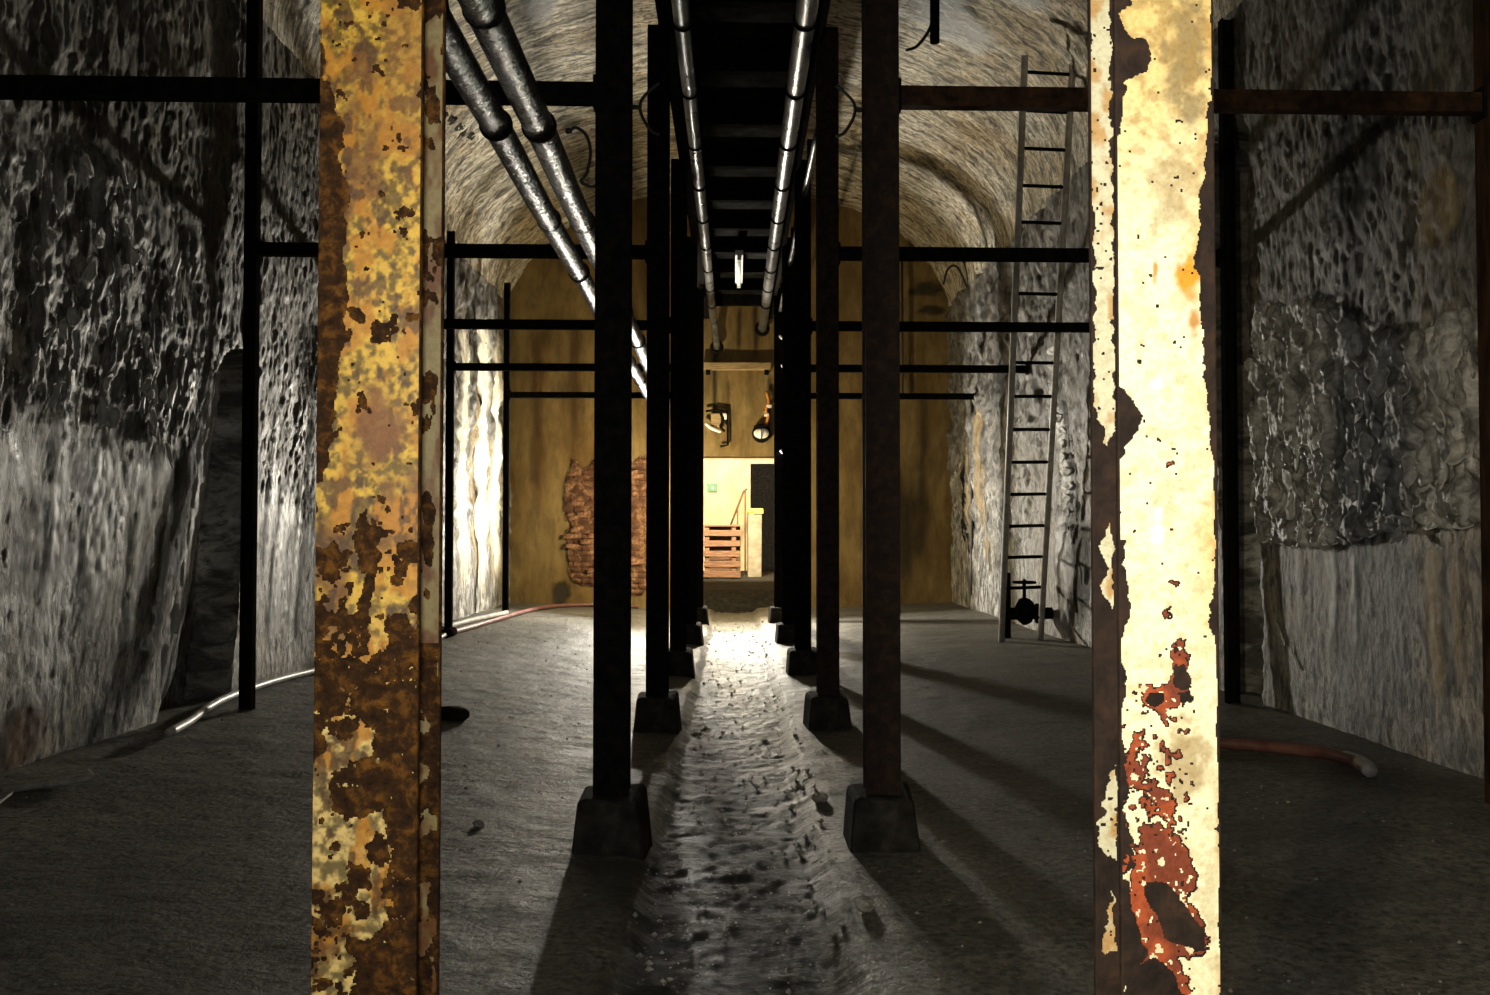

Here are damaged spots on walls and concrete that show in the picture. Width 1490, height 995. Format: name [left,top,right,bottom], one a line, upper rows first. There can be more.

flaking render [563,460,594,586]
flaking render [631,456,646,597]
peeling [1091,0,1220,995]